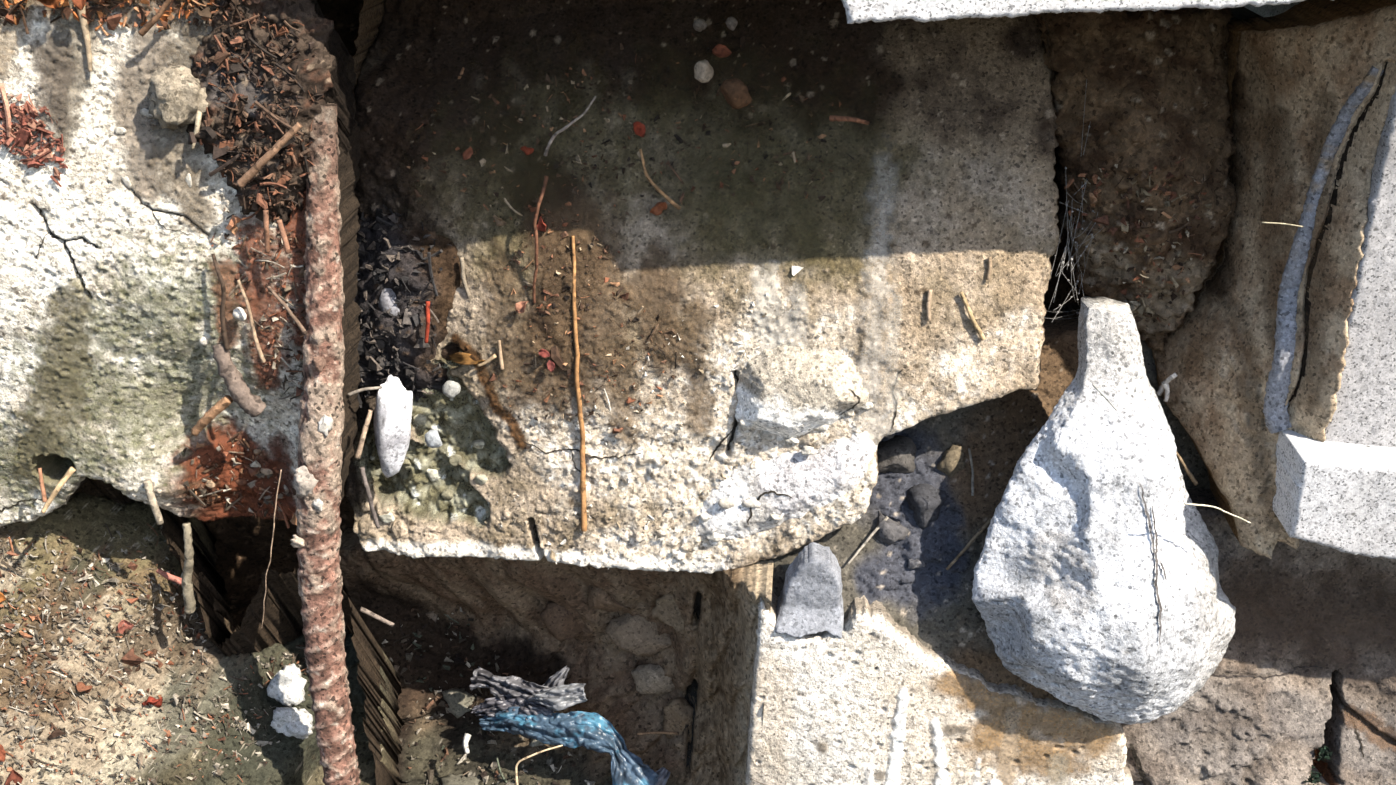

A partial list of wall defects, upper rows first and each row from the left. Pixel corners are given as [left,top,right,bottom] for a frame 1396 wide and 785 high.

spalling [113,169,139,190]
crack [1288,62,1388,408]
water stain [487,189,715,443]
water stain [752,261,797,350]
spalling [361,342,509,523]
spalling [185,449,273,508]
crack [1211,666,1396,757]